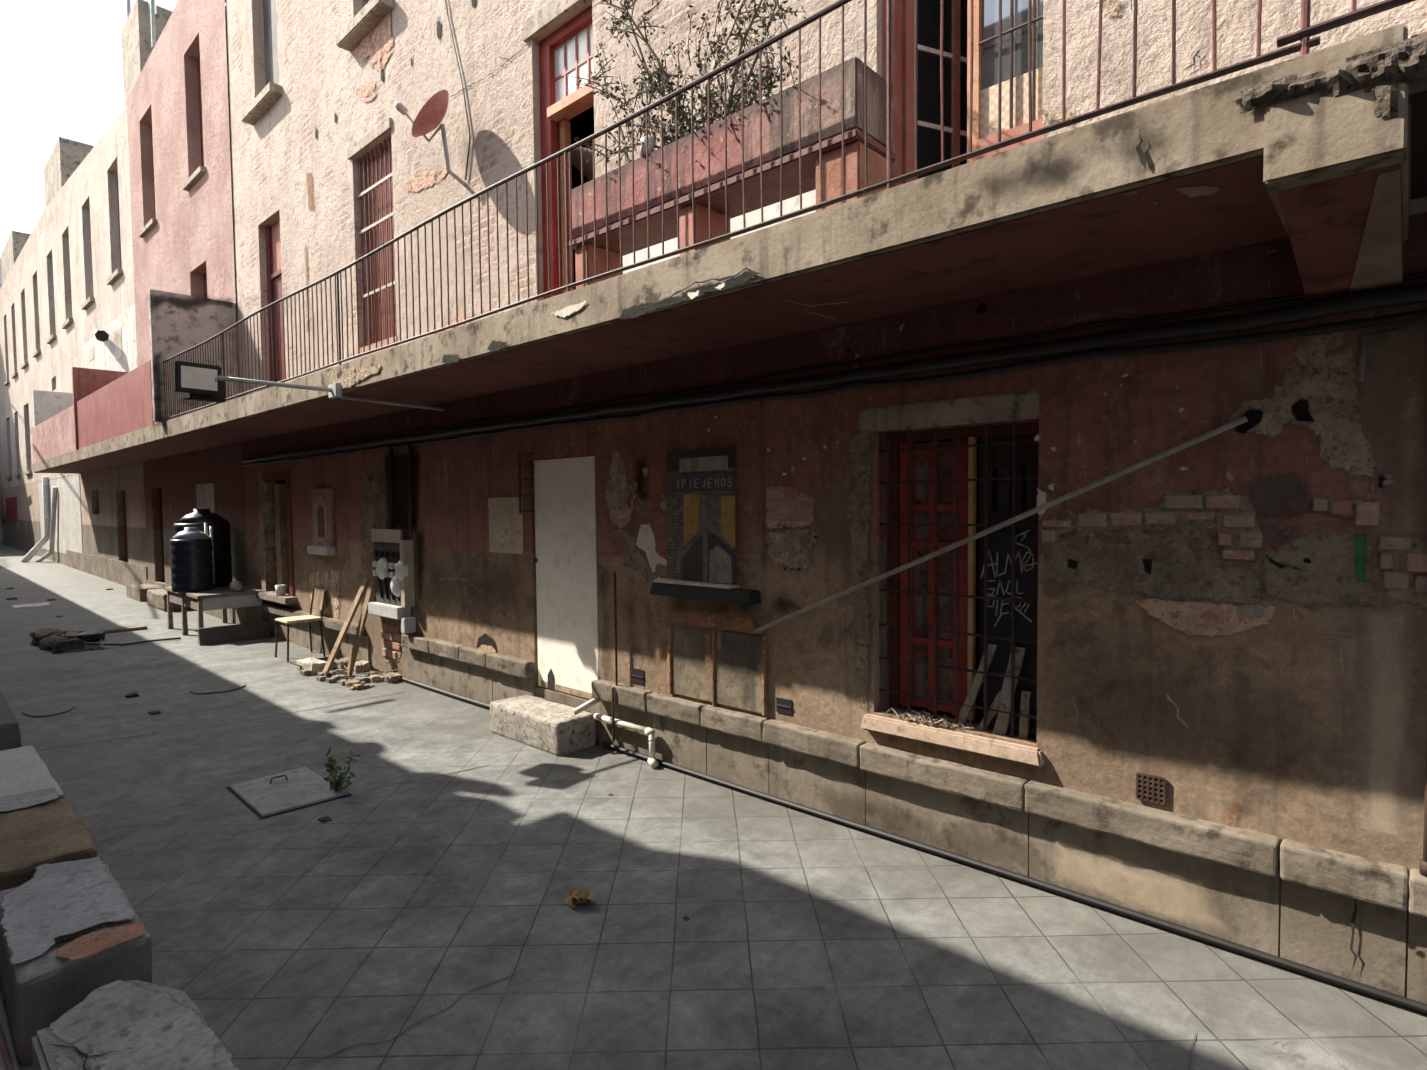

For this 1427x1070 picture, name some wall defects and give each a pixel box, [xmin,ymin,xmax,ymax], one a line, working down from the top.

flaking render [352,12,394,103]
spalling [1234,33,1427,120]
peeling [404,168,447,193]
peeling [438,313,472,333]
flaking render [605,450,667,579]
flaking render [764,473,817,571]
flaking render [1036,331,1427,637]
crack [1350,899,1358,970]